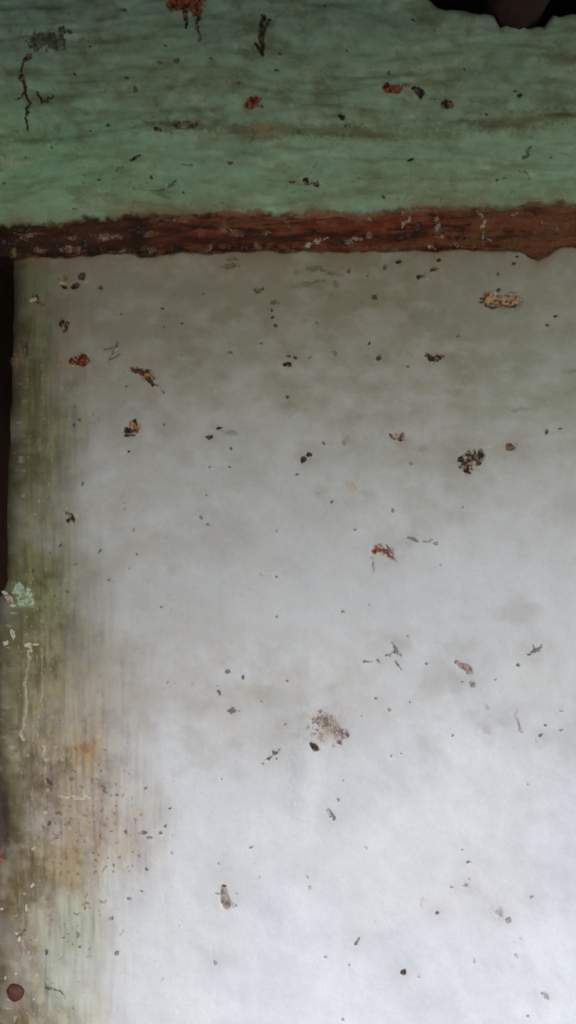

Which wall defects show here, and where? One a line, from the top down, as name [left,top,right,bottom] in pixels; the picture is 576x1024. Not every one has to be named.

spalling [478,272,522,310]
damp [0,779,19,863]